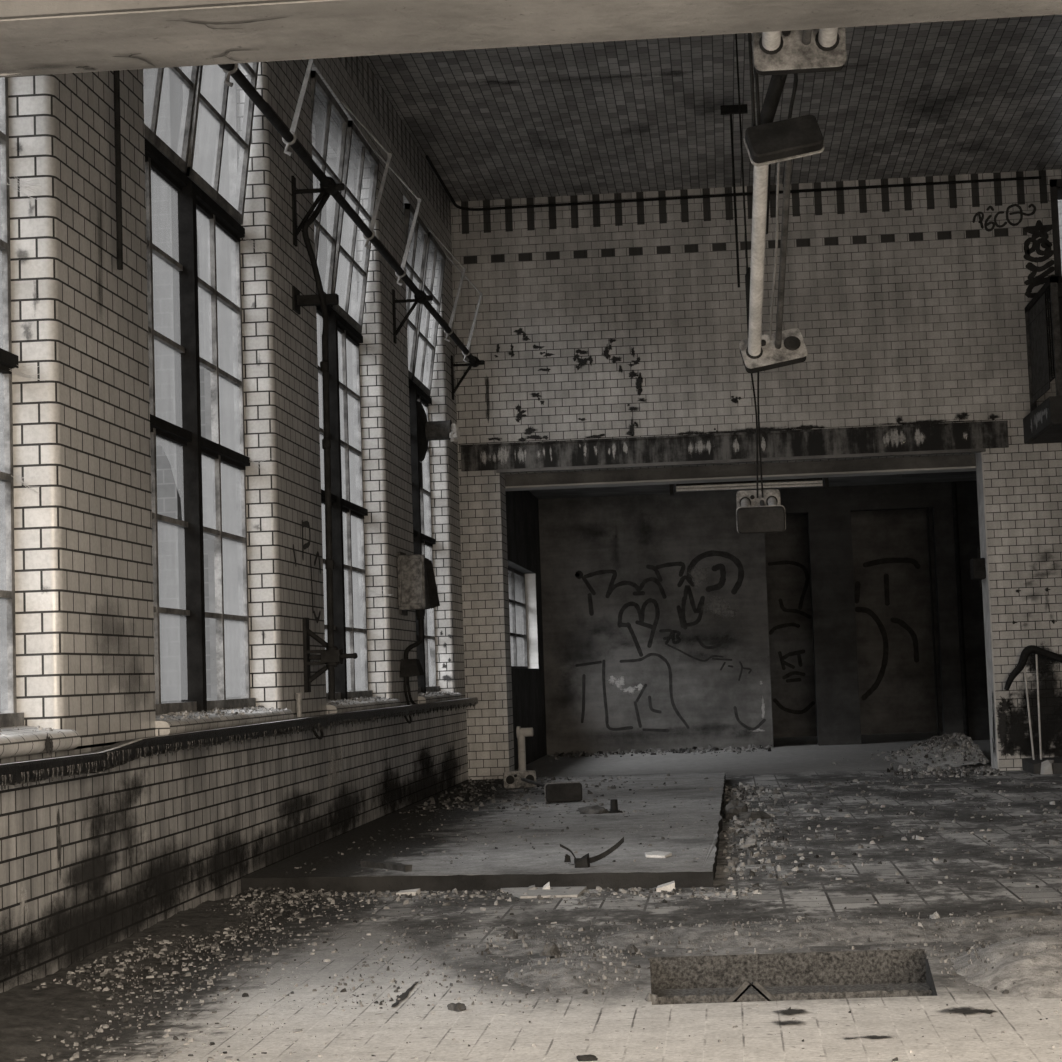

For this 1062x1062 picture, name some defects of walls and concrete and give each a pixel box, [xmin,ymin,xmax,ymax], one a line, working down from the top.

spalling [495,328,555,372]
spalling [573,338,646,436]
spalling [515,404,548,442]
damp [482,447,552,463]
damp [579,442,628,456]